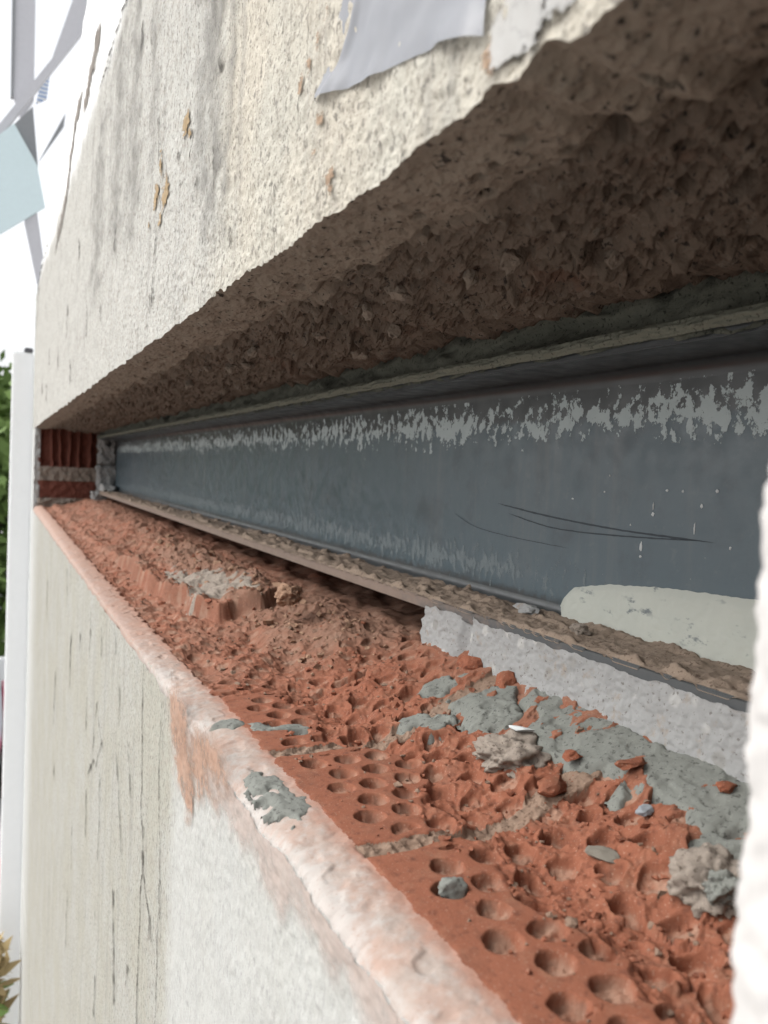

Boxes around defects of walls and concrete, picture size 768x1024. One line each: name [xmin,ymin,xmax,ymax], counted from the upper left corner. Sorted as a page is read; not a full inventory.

peeling [117,370,768,460]
peeling [118,479,586,597]
spalling [456,655,483,670]
spalling [495,670,517,689]
spalling [562,749,583,762]
spalling [614,757,645,771]
spalling [716,781,738,794]
spalling [635,804,654,817]
spalling [585,845,620,864]